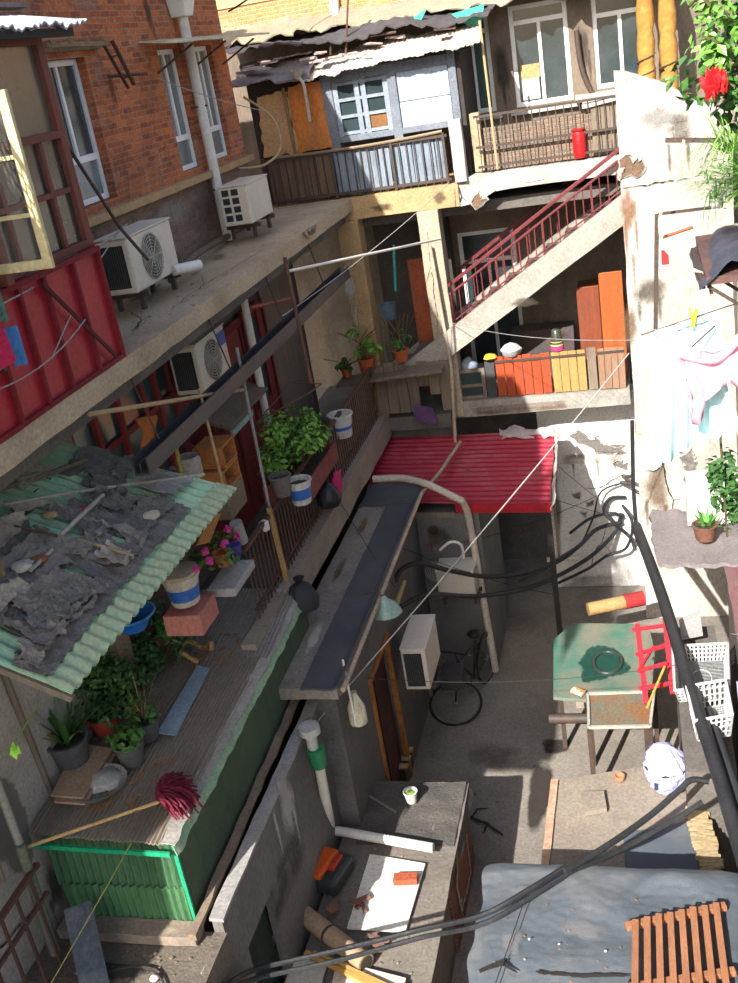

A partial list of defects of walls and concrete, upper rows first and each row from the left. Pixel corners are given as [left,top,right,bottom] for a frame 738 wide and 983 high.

spalling [617,153,647,182]
leakage [274,779,298,839]